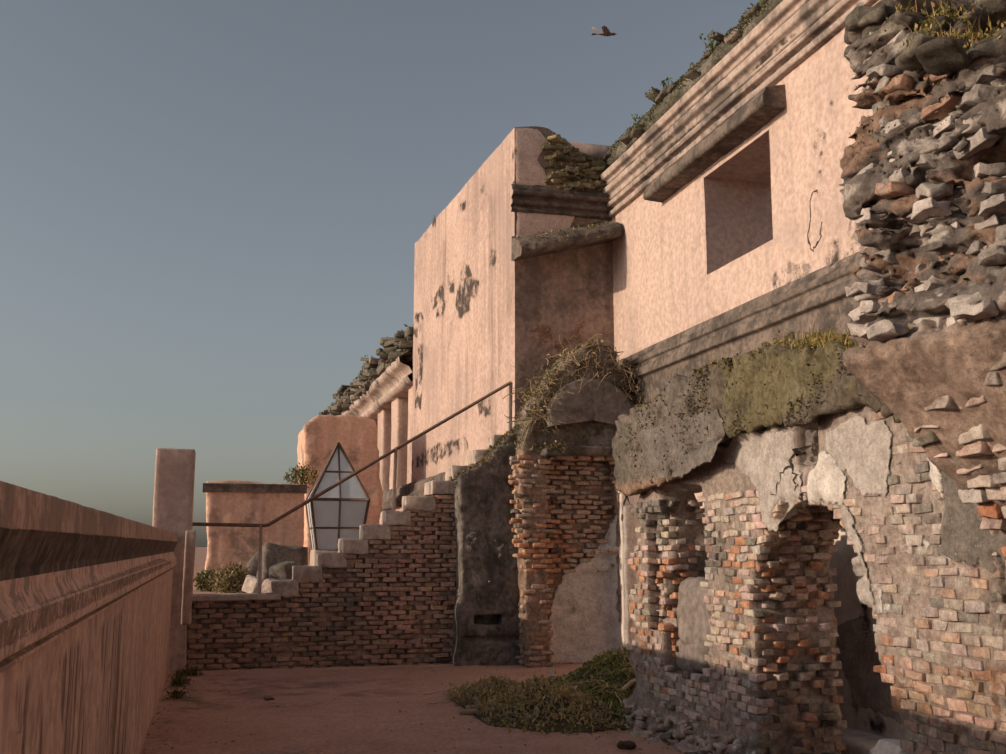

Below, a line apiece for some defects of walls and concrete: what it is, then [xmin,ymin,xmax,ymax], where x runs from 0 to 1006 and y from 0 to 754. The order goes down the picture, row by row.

water stain [433,265,479,318]
water stain [413,312,423,410]
crack [771,443,816,508]